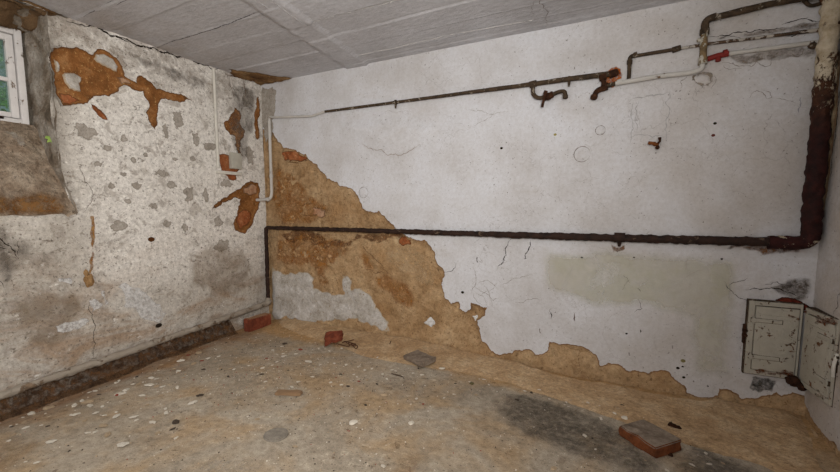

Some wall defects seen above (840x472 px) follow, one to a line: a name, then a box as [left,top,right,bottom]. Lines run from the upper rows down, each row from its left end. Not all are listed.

flaking render [49,46,191,140]
peeling [110,220,128,232]
flaking render [154,69,840,457]
crack [472,240,531,307]